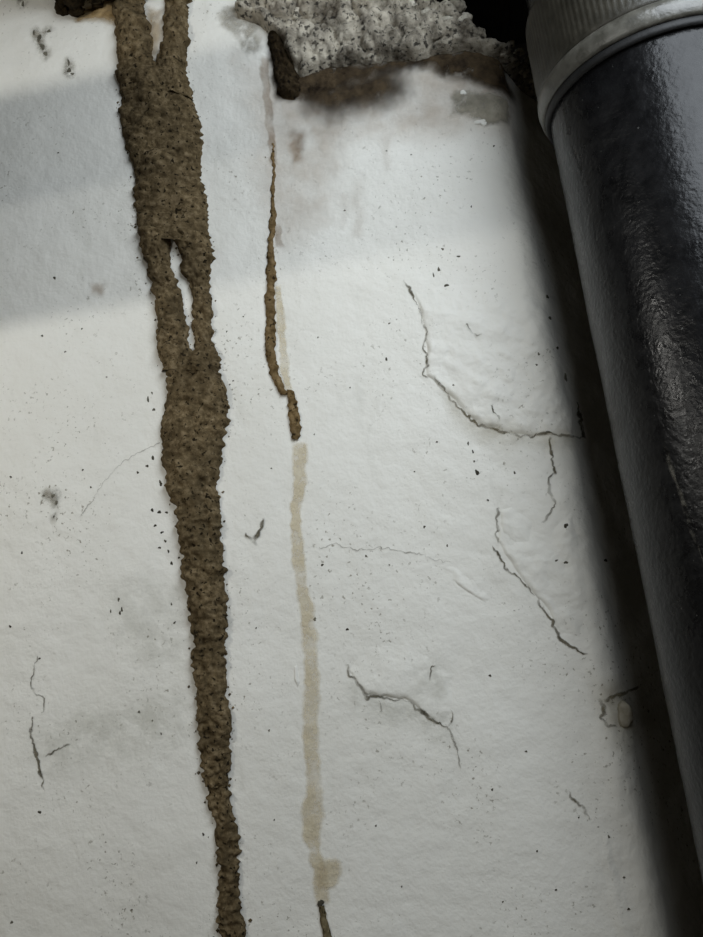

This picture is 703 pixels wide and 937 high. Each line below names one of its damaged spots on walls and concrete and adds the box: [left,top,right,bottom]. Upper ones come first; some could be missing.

spalling [224,0,537,126]
crack [422,329,507,434]
leakage [291,445,306,567]
crack [531,402,585,515]
crack [493,511,585,655]
crack [366,694,459,757]
leakage [304,786,339,900]